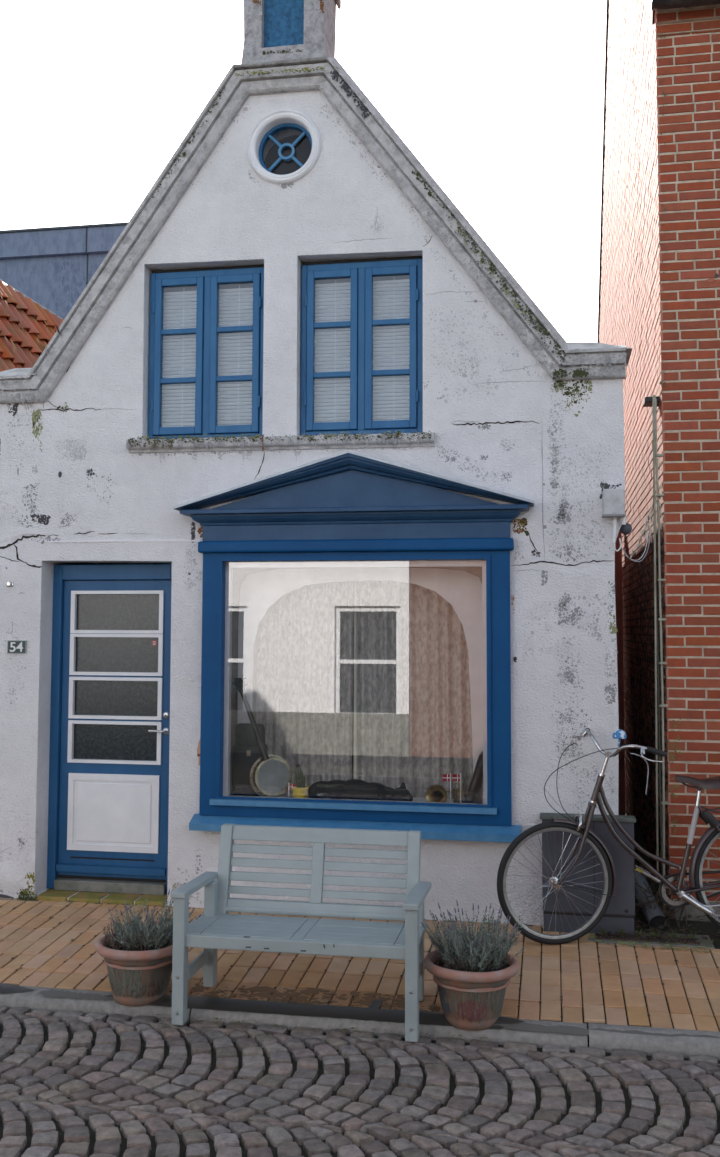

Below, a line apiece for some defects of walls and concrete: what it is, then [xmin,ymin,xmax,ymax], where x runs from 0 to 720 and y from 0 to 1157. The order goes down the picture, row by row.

crack [0,525,143,594]
leakage [0,87,251,544]
leakage [317,70,642,586]
crack [451,419,539,427]
crack [511,452,614,571]
mould [521,581,618,812]